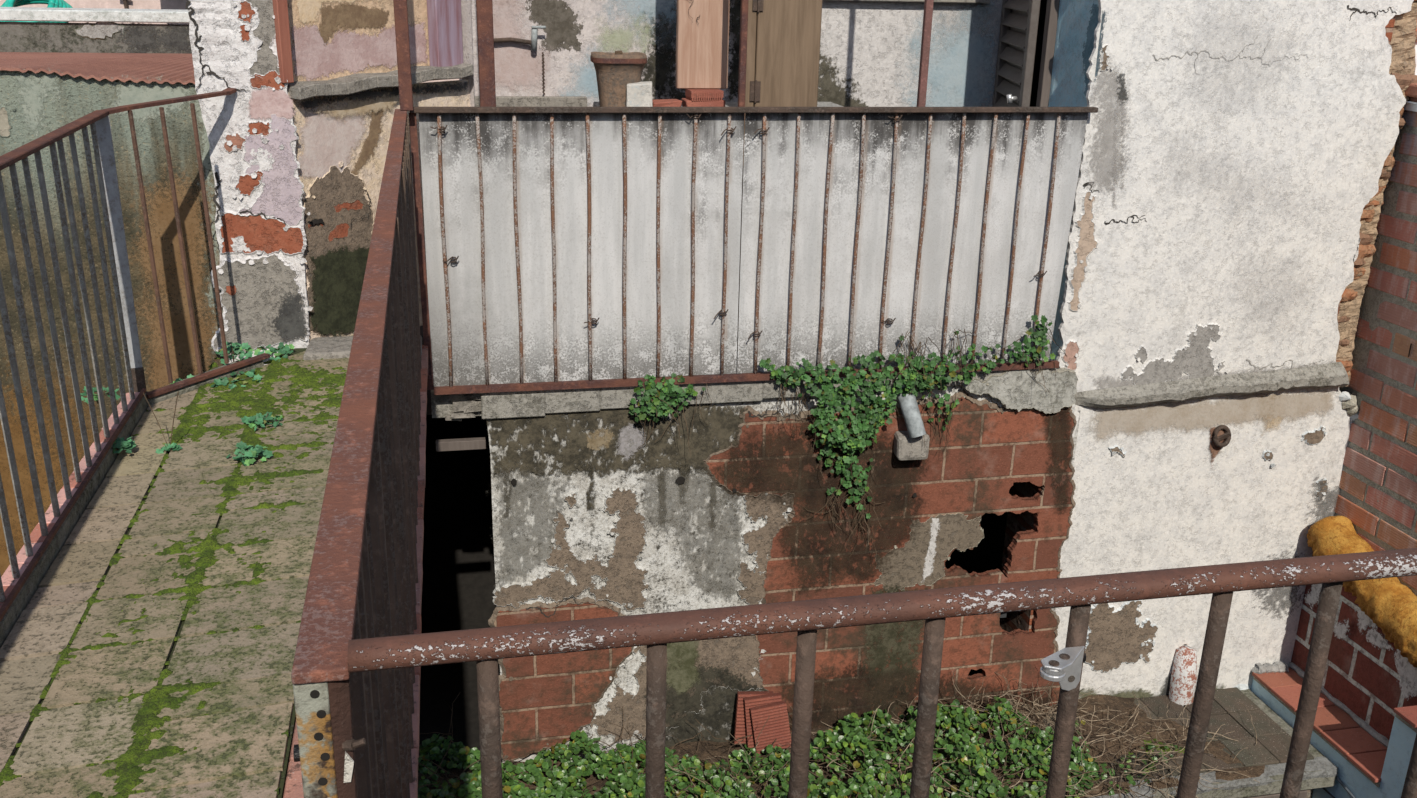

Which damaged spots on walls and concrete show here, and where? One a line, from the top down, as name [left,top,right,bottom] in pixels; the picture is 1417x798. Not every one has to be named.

water stain [523,0,686,101]
spalling [1389,0,1417,129]
peeling [211,0,428,360]
water stain [271,244,370,342]
peeling [1120,322,1228,385]
spalling [1336,145,1395,421]
flaking render [703,339,1080,605]
peeling [488,485,649,627]
flaking render [498,645,647,761]
peeling [666,632,797,754]
flaking render [938,608,1060,710]
peeling [1085,600,1158,673]